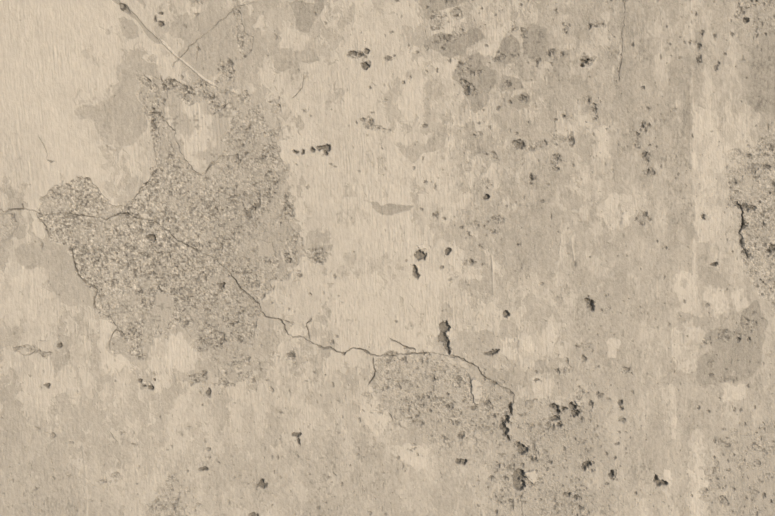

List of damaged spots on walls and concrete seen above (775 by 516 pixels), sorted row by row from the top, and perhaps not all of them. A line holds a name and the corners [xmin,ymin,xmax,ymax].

crack [171,0,258,70]
spalling [354,111,391,137]
spalling [582,94,599,123]
flaking render [0,0,327,407]
spalling [634,211,652,226]
crack [0,141,515,415]
peeling [663,469,673,489]
flaking render [690,419,775,516]